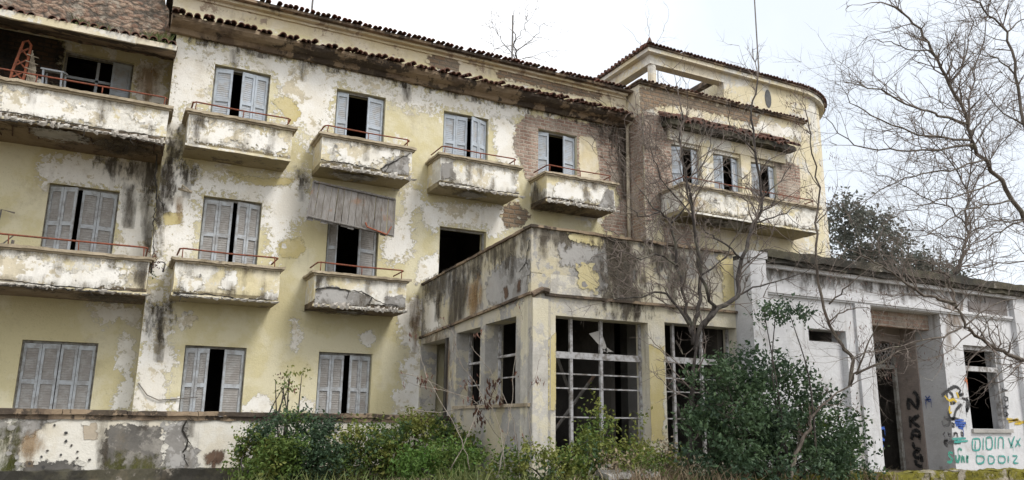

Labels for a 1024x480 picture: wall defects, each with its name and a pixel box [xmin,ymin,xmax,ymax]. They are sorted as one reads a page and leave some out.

water stain [78,127,197,249]
water stain [67,263,179,362]
flaking render [0,29,819,471]
water stain [399,228,693,345]
crack [182,420,191,465]